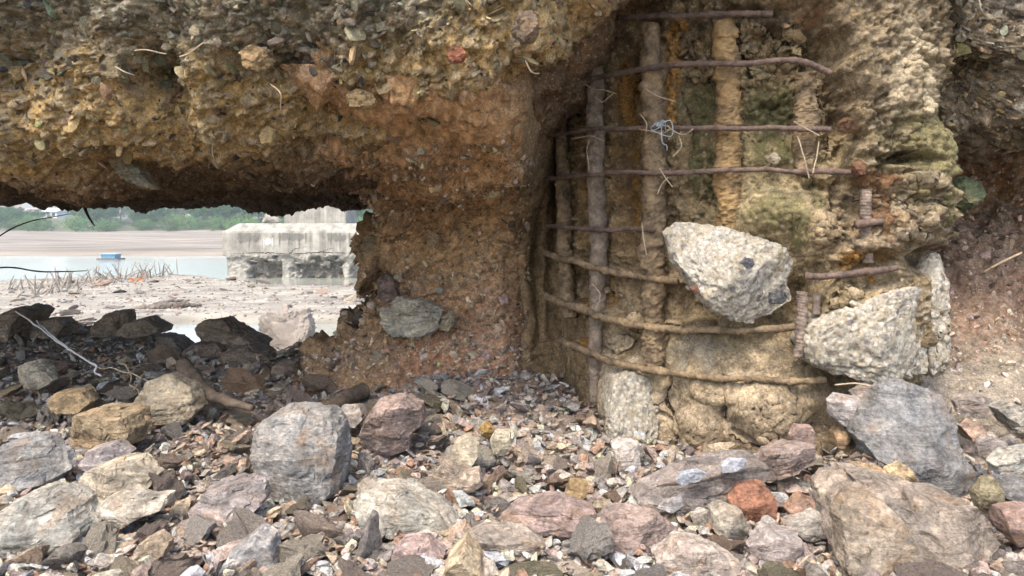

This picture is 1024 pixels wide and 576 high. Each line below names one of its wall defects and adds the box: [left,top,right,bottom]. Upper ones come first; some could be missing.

rust [662,19,689,123]
spalling [677,25,715,89]
spalling [736,17,807,89]
rust [618,61,642,234]
damp [744,91,794,166]
damp [881,0,963,225]
damp [746,186,825,253]
spalling [604,311,644,357]
spalling [829,287,872,310]